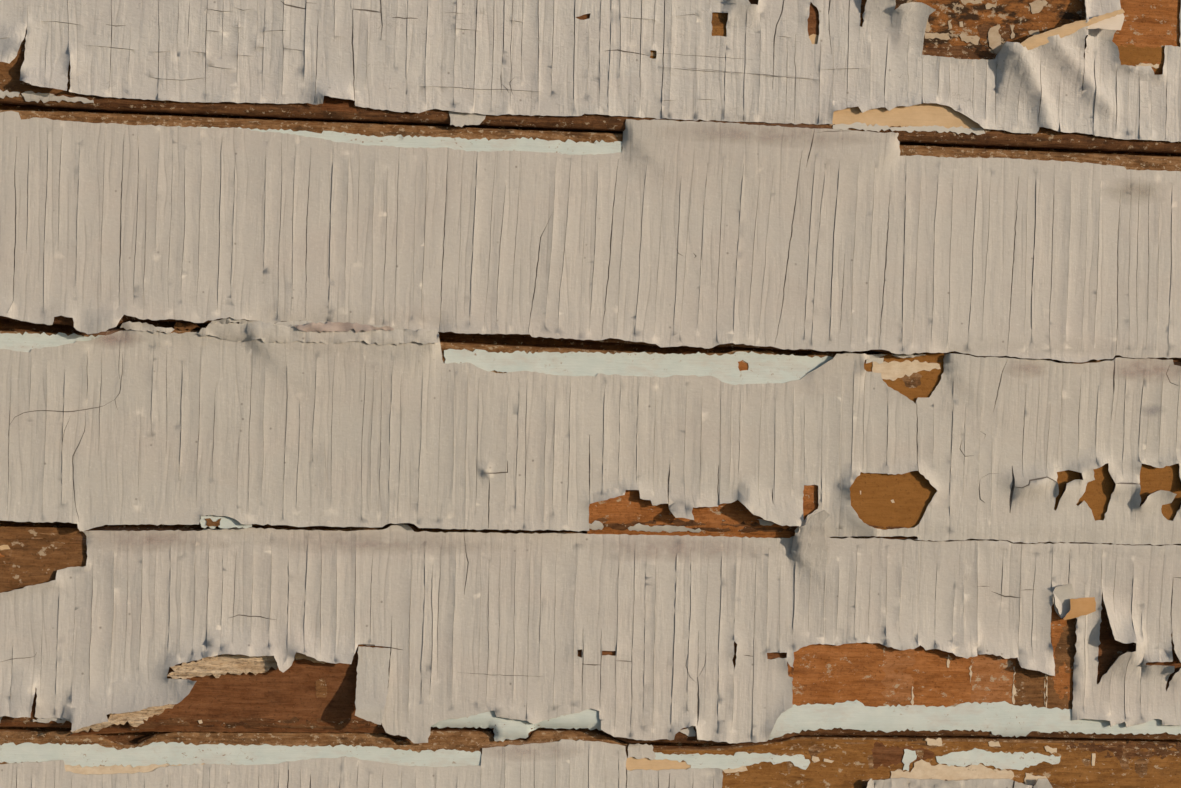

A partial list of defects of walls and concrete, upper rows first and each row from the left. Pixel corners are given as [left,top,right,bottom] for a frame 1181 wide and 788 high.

peeling [895,0,1181,75]
crack [973,64,1140,132]
crack [7,0,1054,343]
crack [1096,203,1172,319]
crack [7,345,335,519]
peeling [444,349,834,385]
crack [950,366,1056,509]
crack [1,374,775,723]
peeling [587,485,830,573]
peeling [850,471,937,539]
peeling [0,645,481,775]
peeling [626,583,1181,788]